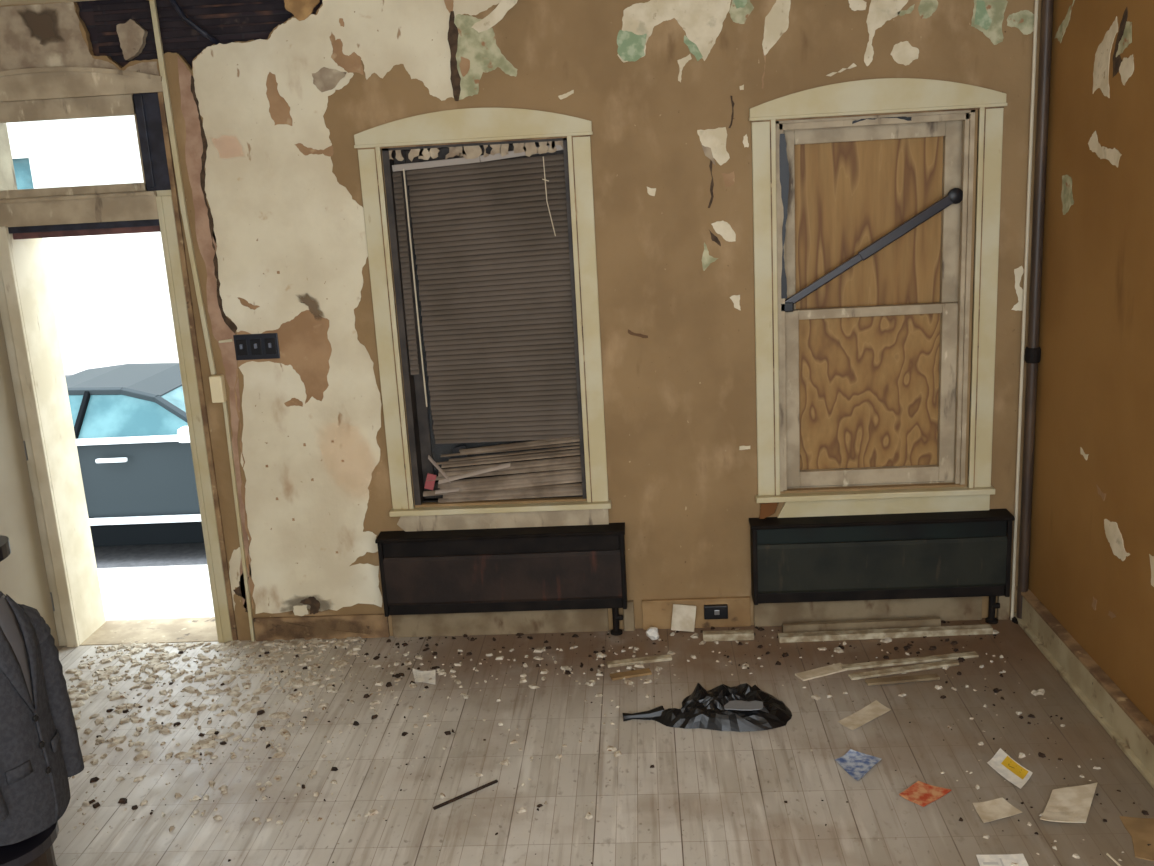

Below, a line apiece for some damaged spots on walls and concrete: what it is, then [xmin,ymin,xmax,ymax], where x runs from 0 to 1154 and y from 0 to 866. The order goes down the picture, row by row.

peeling [617,0,754,82]
peeling [762,0,791,89]
peeling [826,0,938,76]
peeling [971,0,1034,45]
peeling [1093,7,1134,98]
peeling [389,141,563,161]
peeling [697,127,735,187]
peeling [1088,131,1122,168]
peeling [701,221,736,271]
peeling [0,0,518,614]
peeling [730,295,741,311]
peeling [1104,519,1130,561]